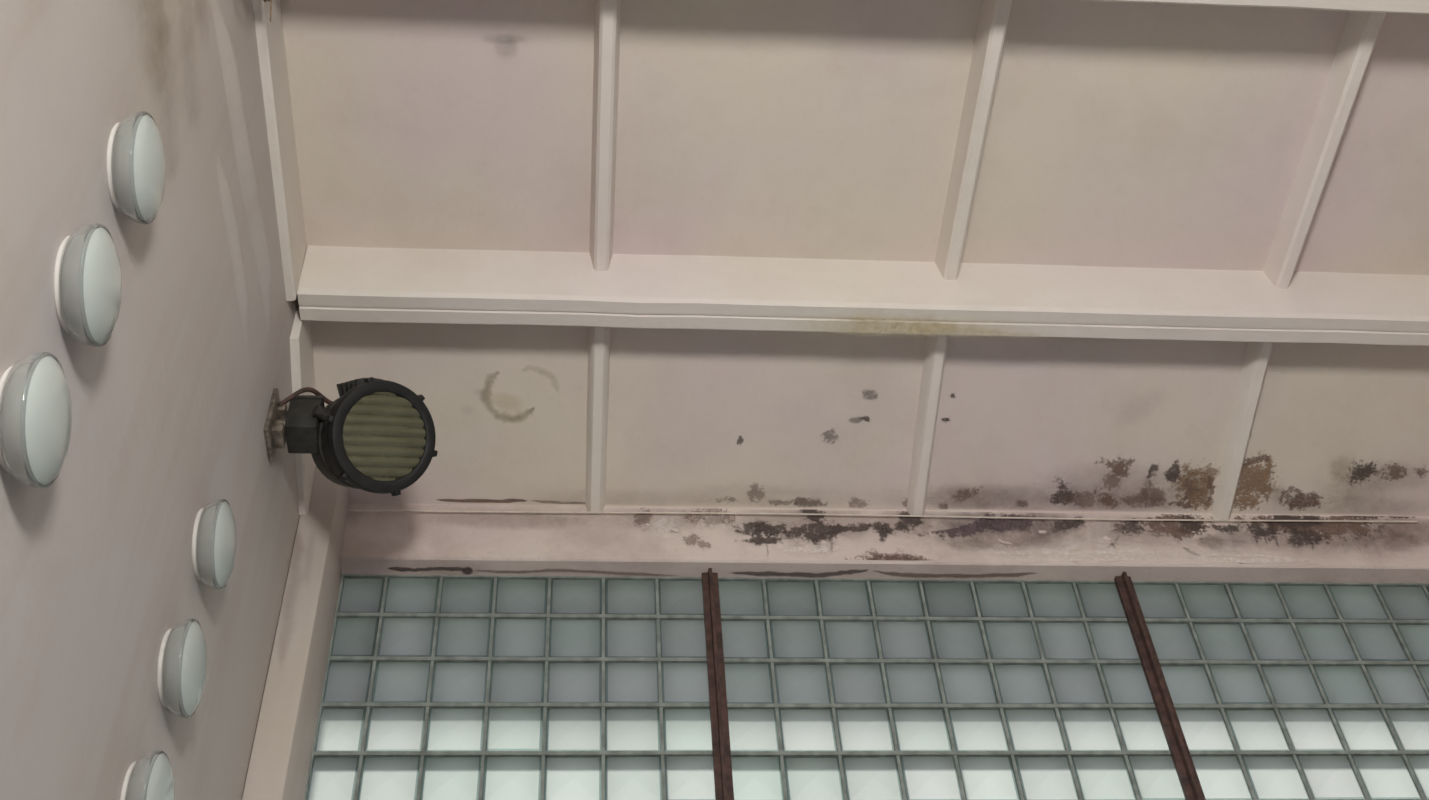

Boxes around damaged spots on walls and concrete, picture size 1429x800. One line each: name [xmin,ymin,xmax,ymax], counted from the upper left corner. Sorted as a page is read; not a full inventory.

water stain [1100,458,1134,477]
water stain [1147,461,1180,482]
water stain [1349,462,1426,484]
water stain [1050,479,1117,531]
water stain [735,498,1035,545]
water stain [1115,514,1415,546]